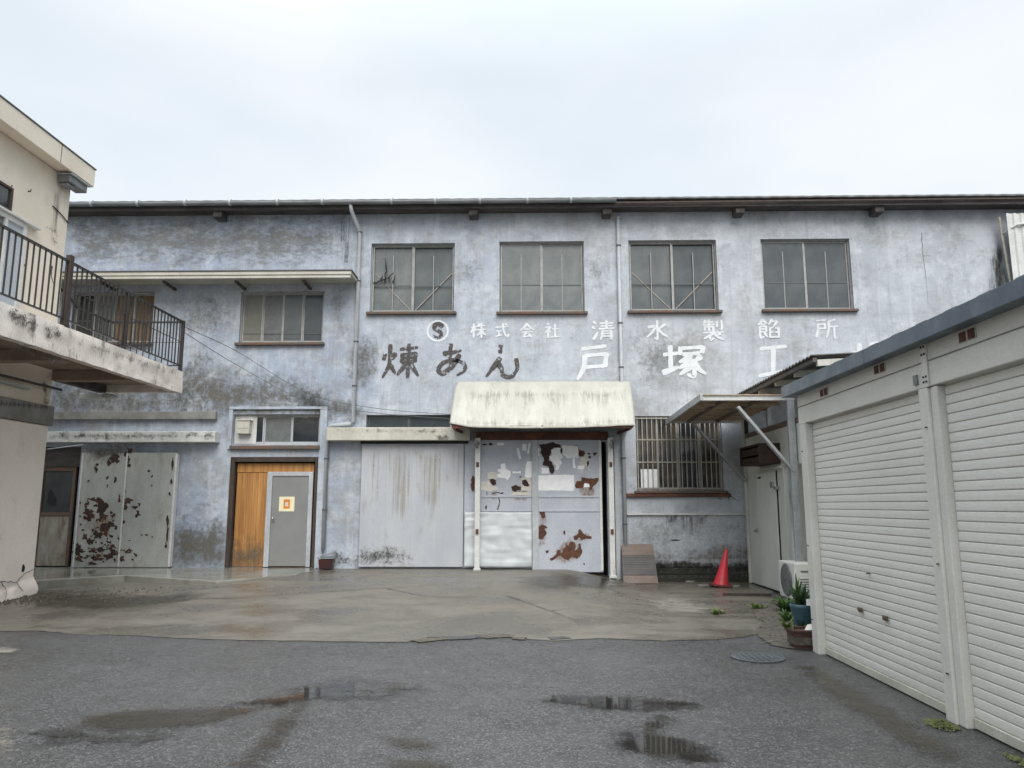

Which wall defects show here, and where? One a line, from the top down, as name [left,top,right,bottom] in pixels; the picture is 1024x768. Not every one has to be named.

water stain [0,356,357,415]
peeling [481,443,590,495]
rust [538,442,599,496]
rust [72,448,153,565]
water stain [173,525,261,565]
water stain [335,548,399,564]
rust [539,512,592,565]